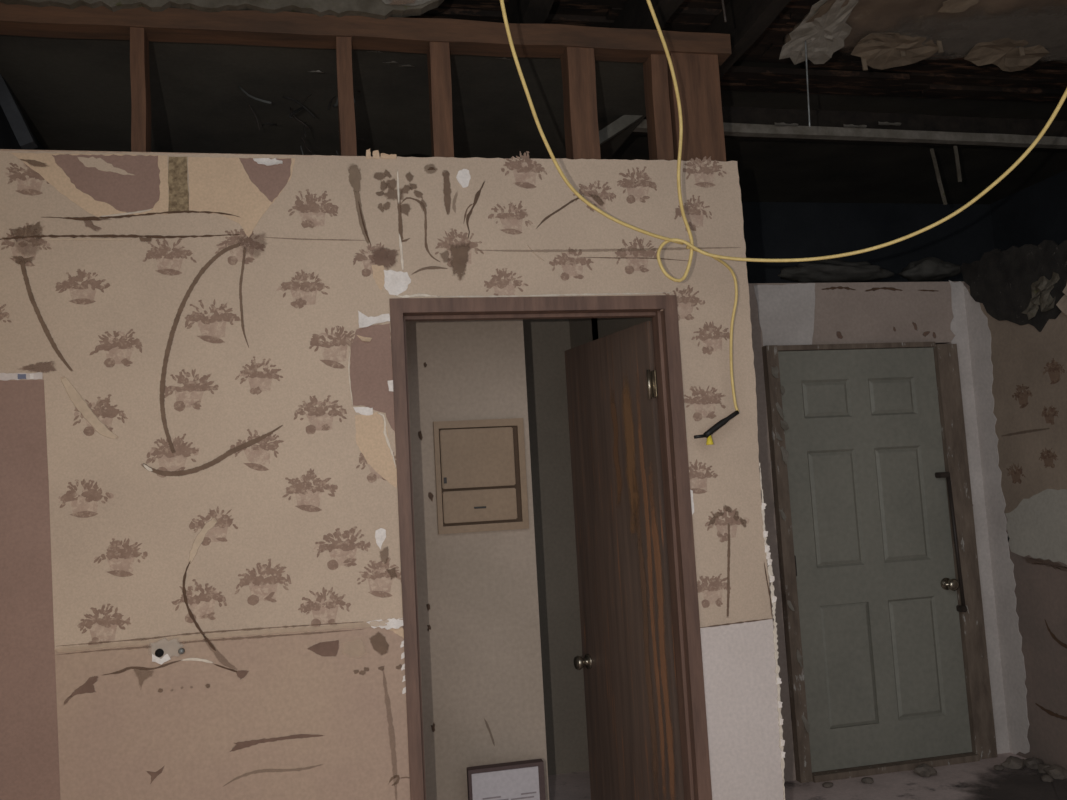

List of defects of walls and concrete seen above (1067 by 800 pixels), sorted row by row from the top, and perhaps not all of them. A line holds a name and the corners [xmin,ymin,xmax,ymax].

crack [0,211,240,242]
hole [960,240,1067,332]
peeling [0,362,61,800]
crack [104,518,248,678]
water stain [968,767,1067,800]